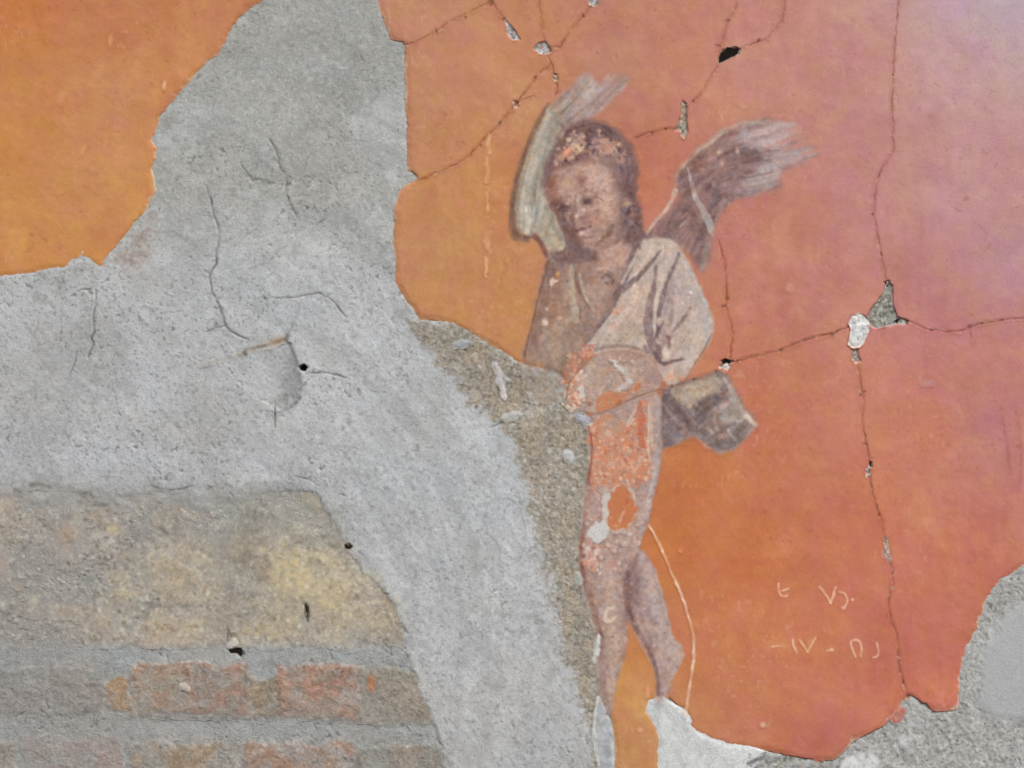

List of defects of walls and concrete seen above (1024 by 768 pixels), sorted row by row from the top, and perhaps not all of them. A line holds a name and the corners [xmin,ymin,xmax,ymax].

crack [399,0,592,186]
spalling [504,17,521,41]
spalling [674,101,688,140]
crack [633,0,788,141]
crack [870,0,902,282]
crack [197,184,249,362]
spalling [272,344,307,415]
spalling [490,359,525,423]
crack [555,238,849,419]
spalling [847,282,907,365]
crack [855,360,913,704]
spalling [226,637,240,649]